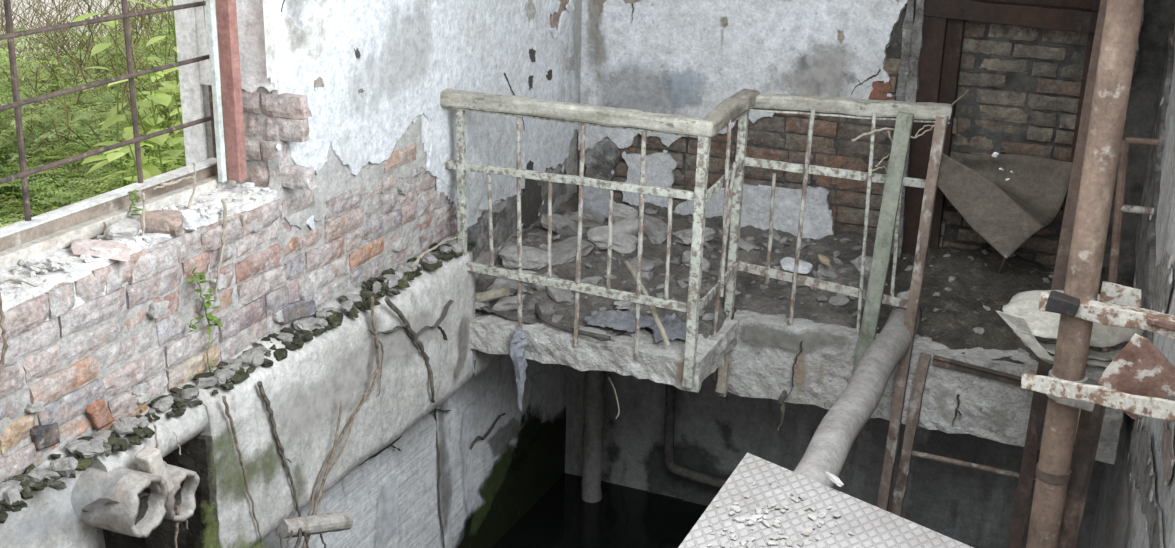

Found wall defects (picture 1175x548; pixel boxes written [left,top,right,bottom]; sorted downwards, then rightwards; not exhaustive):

flaking render [525,0,575,38]
flaking render [0,77,895,499]
leakage [232,540,265,548]
spalling [825,418,1040,548]
spalling [1077,460,1104,548]